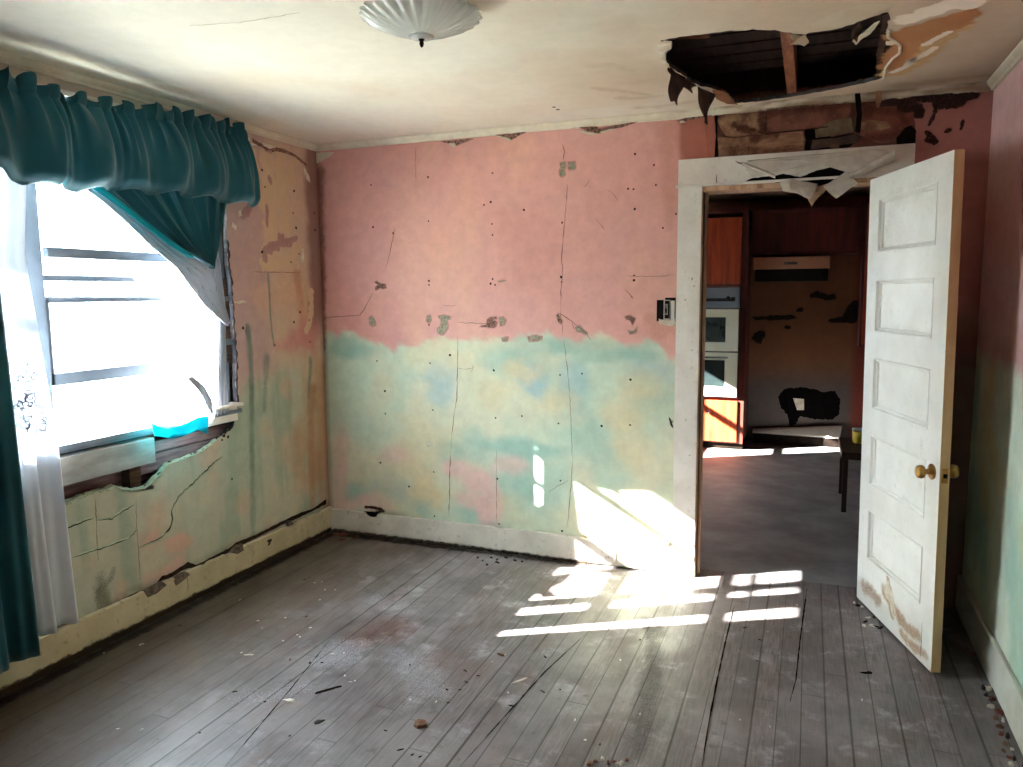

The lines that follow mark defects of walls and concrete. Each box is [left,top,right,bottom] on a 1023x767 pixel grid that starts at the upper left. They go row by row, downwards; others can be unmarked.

peeling [874,0,990,77]
peeling [232,141,311,272]
spalling [224,240,246,408]
peeling [425,314,452,336]
peeling [480,316,509,342]
crack [550,180,618,518]
peeling [624,314,638,335]
crack [68,456,223,570]
spalling [65,421,234,506]
damp [245,274,275,541]
crack [445,305,488,517]
spalling [778,387,840,426]